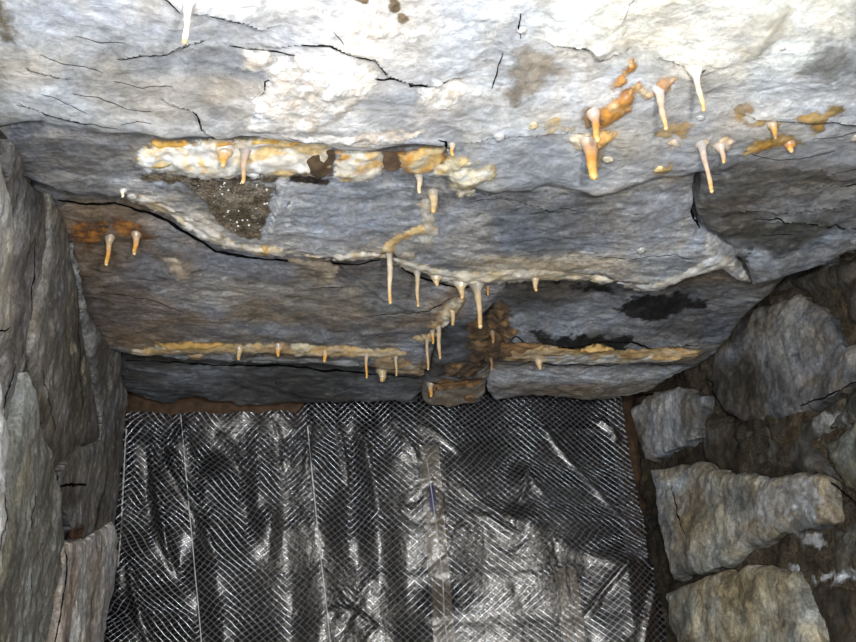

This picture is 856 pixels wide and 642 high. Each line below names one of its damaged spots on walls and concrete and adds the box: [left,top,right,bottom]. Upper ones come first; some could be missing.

water stain [389,0,409,24]
crack [76,36,205,60]
crack [229,31,446,87]
crack [18,55,173,129]
crack [192,111,259,140]
water stain [569,59,678,174]
crack [745,122,856,160]
crack [690,181,700,227]
water stain [126,136,856,321]
water stain [412,297,466,343]
water stain [129,323,424,376]
water stain [499,330,702,365]